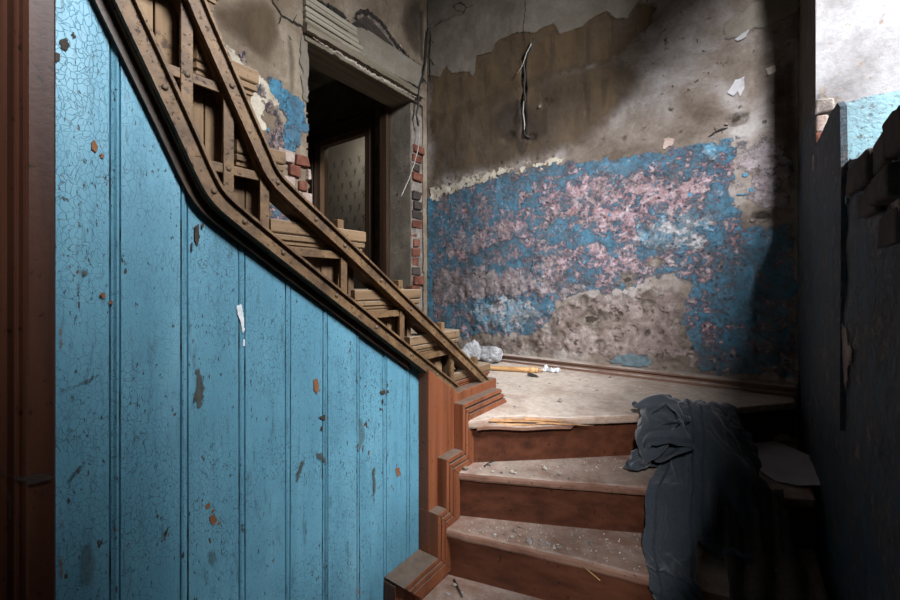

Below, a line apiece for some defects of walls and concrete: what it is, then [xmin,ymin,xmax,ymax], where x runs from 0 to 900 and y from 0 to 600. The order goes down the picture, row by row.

crack [272,0,304,36]
peeling [225,44,246,65]
peeling [250,0,639,203]
spalling [728,77,745,96]
peeling [724,114,793,225]
spalling [407,111,719,368]
peeling [841,324,852,389]